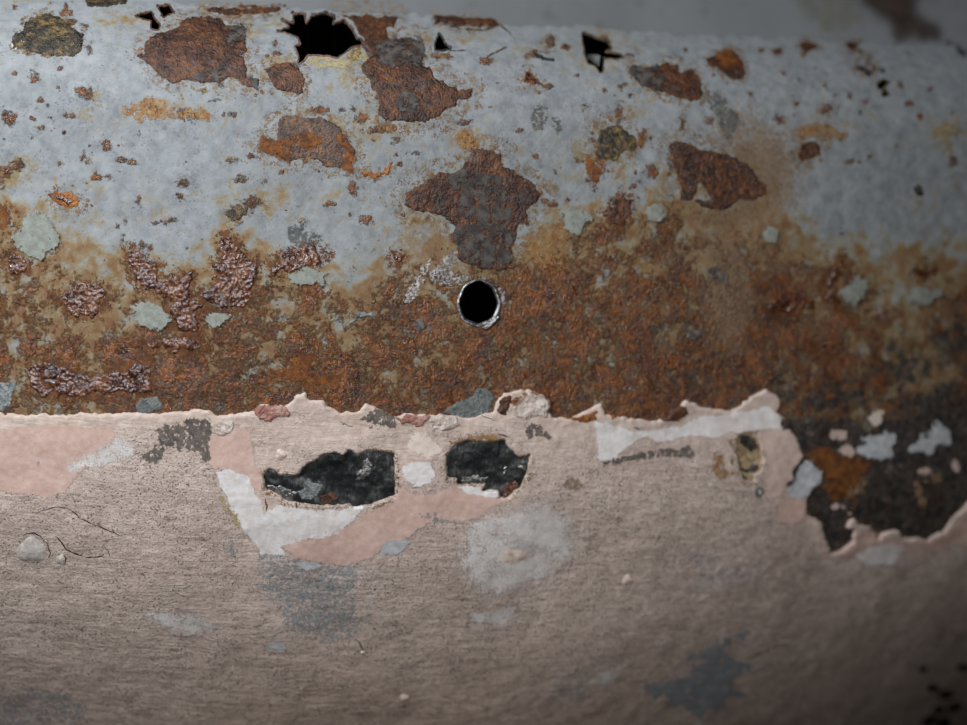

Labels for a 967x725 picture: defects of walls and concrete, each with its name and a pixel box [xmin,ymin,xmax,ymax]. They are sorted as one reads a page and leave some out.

corrosion [620,42,750,111]
corrosion [39,182,90,218]
corrosion [122,0,571,293]
corrosion [577,105,784,234]
corrosion [20,200,336,406]
peeling [0,381,16,411]
peeling [135,396,163,414]
peeling [444,388,495,418]
corrosion [497,388,553,415]
corrosion [659,405,688,421]
spalling [260,447,399,511]
spalling [444,434,534,504]